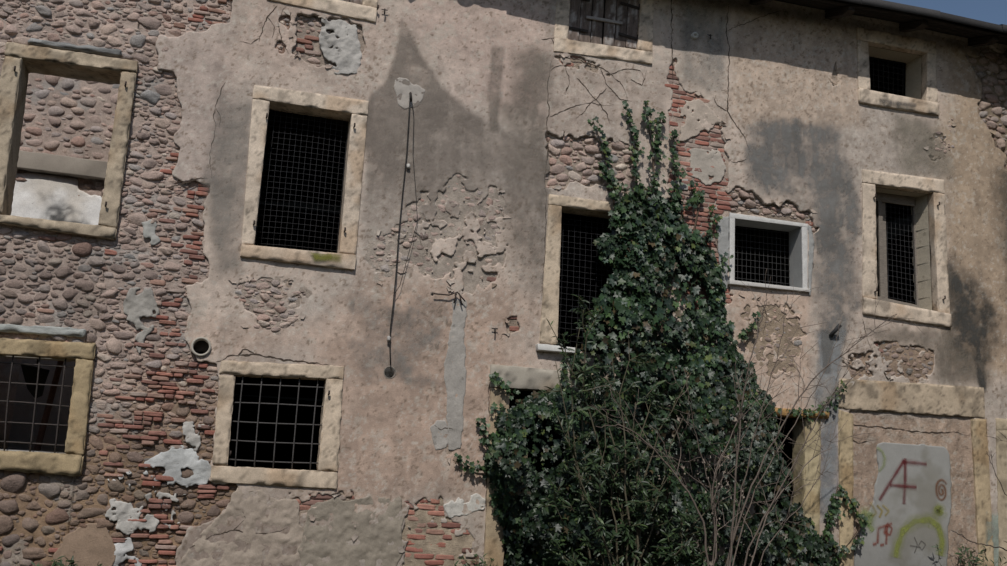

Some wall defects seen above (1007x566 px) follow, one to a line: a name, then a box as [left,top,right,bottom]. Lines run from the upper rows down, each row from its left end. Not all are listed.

flaking render [228,276,312,335]
spalling [275,9,365,69]
leakage [365,34,499,196]
flaking render [364,173,511,294]
leakage [510,51,548,172]
spalling [545,130,638,194]
crack [541,38,646,299]
crack [668,0,676,84]
spalling [665,59,818,265]
crack [714,6,785,163]
leakage [747,119,861,518]
flaking render [53,421,211,566]